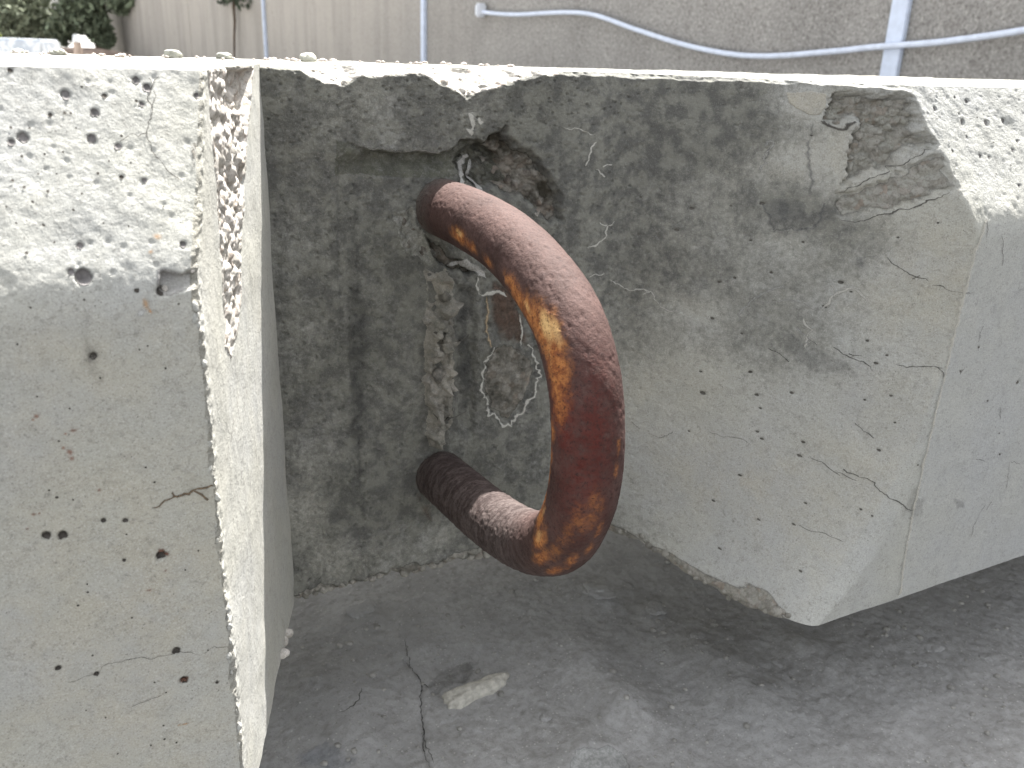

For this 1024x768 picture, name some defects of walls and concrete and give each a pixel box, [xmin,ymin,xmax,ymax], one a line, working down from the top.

spalling [821,95,933,179]
spalling [207,64,559,358]
spalling [836,157,952,215]
corrosion [485,283,525,347]
crack [152,485,213,508]
crack [812,458,913,511]
crack [405,641,434,763]